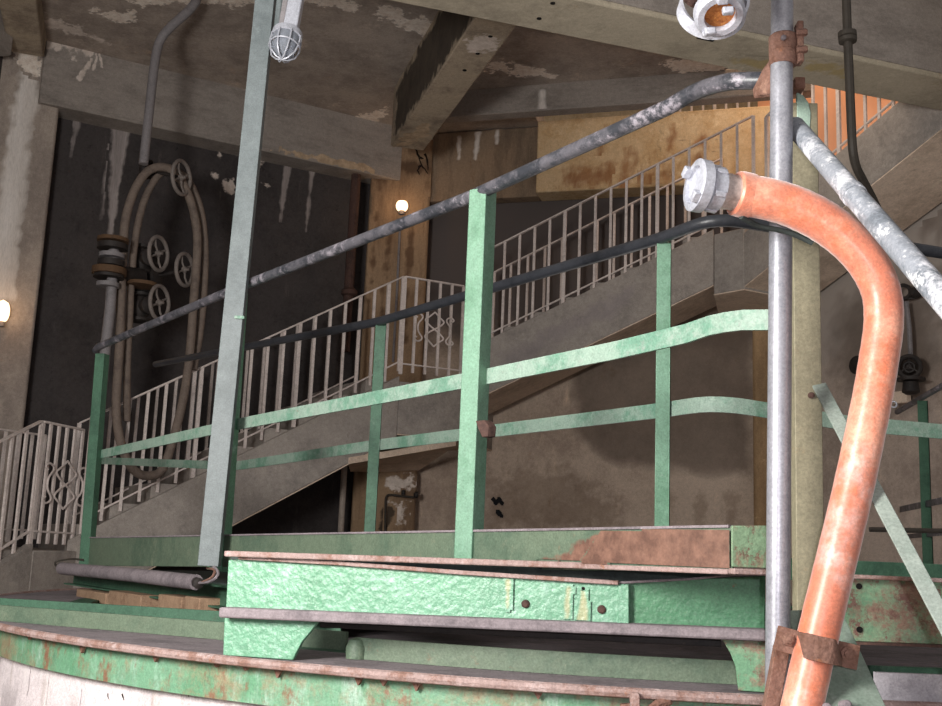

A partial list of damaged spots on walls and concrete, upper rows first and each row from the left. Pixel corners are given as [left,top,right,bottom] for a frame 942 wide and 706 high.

peeling [74,0,255,26]
peeling [481,55,562,80]
water stain [0,11,117,305]
efflorescence [96,128,132,235]
efflorescence [276,165,293,224]
efflorescence [302,171,318,235]
corrosion [550,118,718,189]
spalling [379,471,417,530]
corrosion [534,529,729,568]